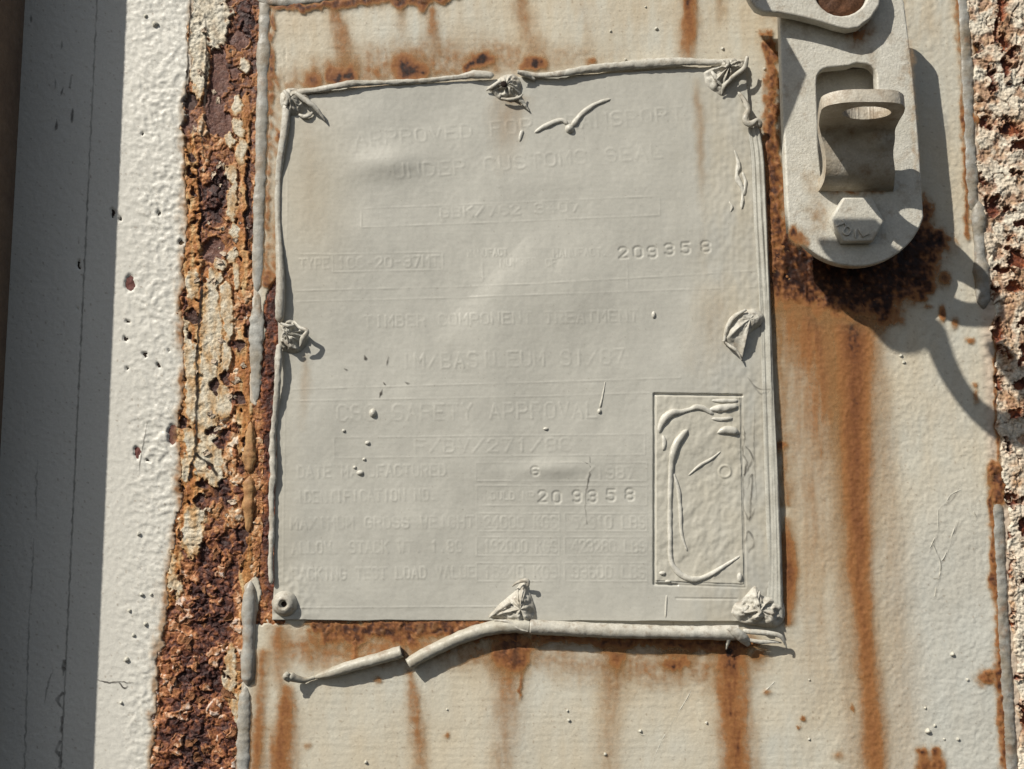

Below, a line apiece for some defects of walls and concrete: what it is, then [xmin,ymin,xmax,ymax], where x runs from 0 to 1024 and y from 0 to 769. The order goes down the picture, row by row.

rust [680,0,697,57]
rust [954,0,978,55]
rust [148,0,548,769]
rust [444,633,765,769]
rust [758,29,980,769]
rust [977,321,1007,769]
peeling [967,0,1024,769]